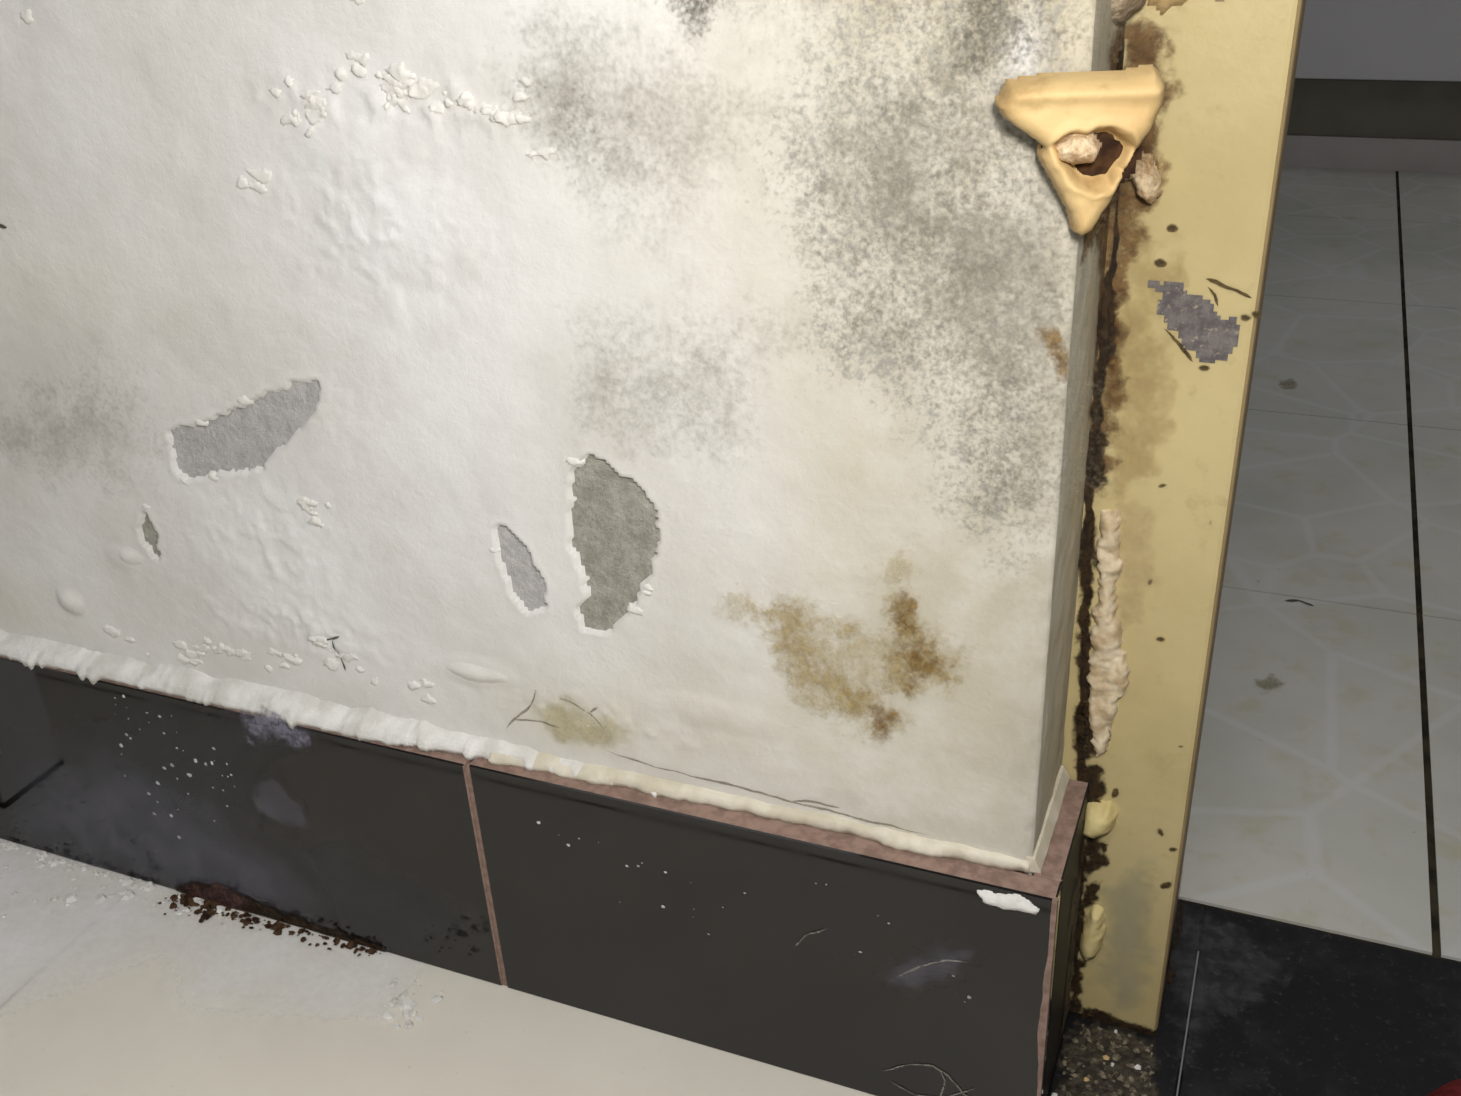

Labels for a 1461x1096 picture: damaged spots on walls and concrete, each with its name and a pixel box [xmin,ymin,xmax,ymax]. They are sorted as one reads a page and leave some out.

water stain [1110,22,1177,107]
water stain [1140,124,1168,185]
water stain [1042,329,1068,375]
spalling [1147,259,1261,371]
spalling [171,380,320,486]
spalling [489,525,549,611]
spalling [565,454,660,631]
water stain [1072,179,1153,803]
rust [176,880,385,952]
water stain [1068,837,1156,1037]